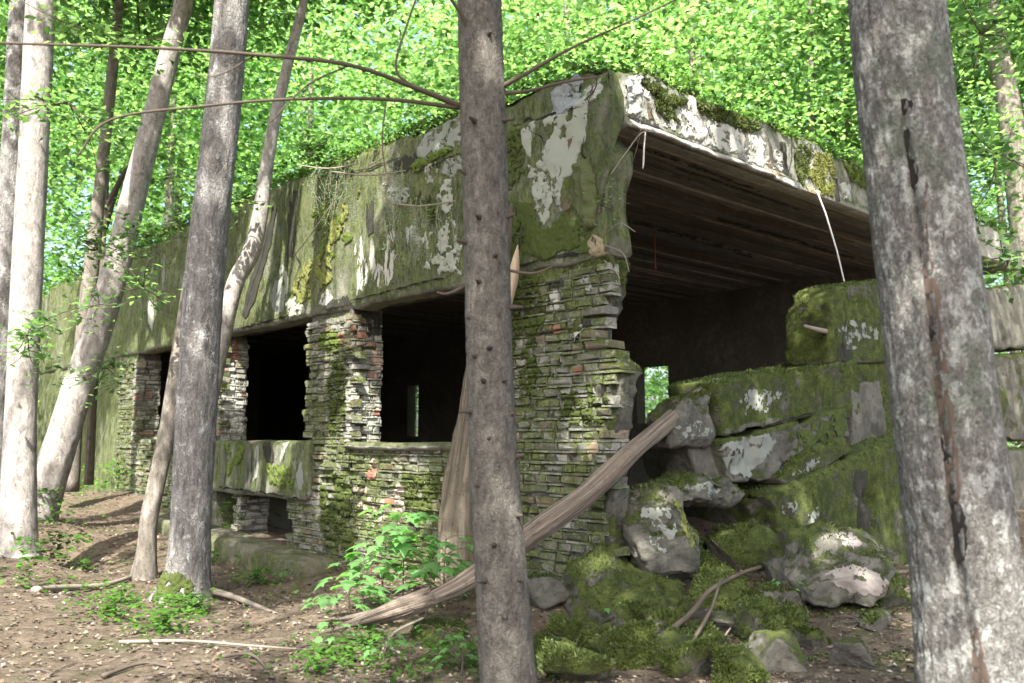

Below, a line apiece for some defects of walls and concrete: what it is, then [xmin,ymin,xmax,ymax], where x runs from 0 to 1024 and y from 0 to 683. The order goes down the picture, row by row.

peeling [521,73,604,225]
peeling [625,85,650,115]
peeling [663,95,784,179]
peeling [416,116,462,276]
peeling [840,182,852,202]
peeling [718,433,776,479]